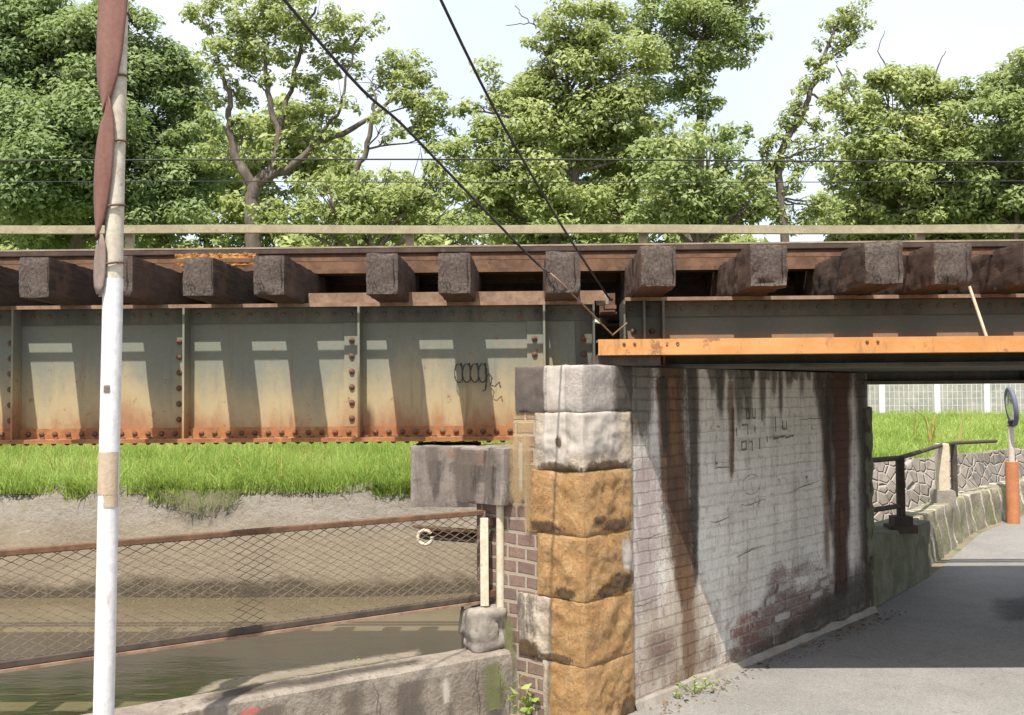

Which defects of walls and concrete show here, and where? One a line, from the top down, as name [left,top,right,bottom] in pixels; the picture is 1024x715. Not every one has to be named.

leakage [454,447,494,499]
leakage [659,377,667,452]
leakage [687,369,833,581]
peeling [728,557,834,665]
leakage [754,373,874,655]
rust [825,373,852,592]